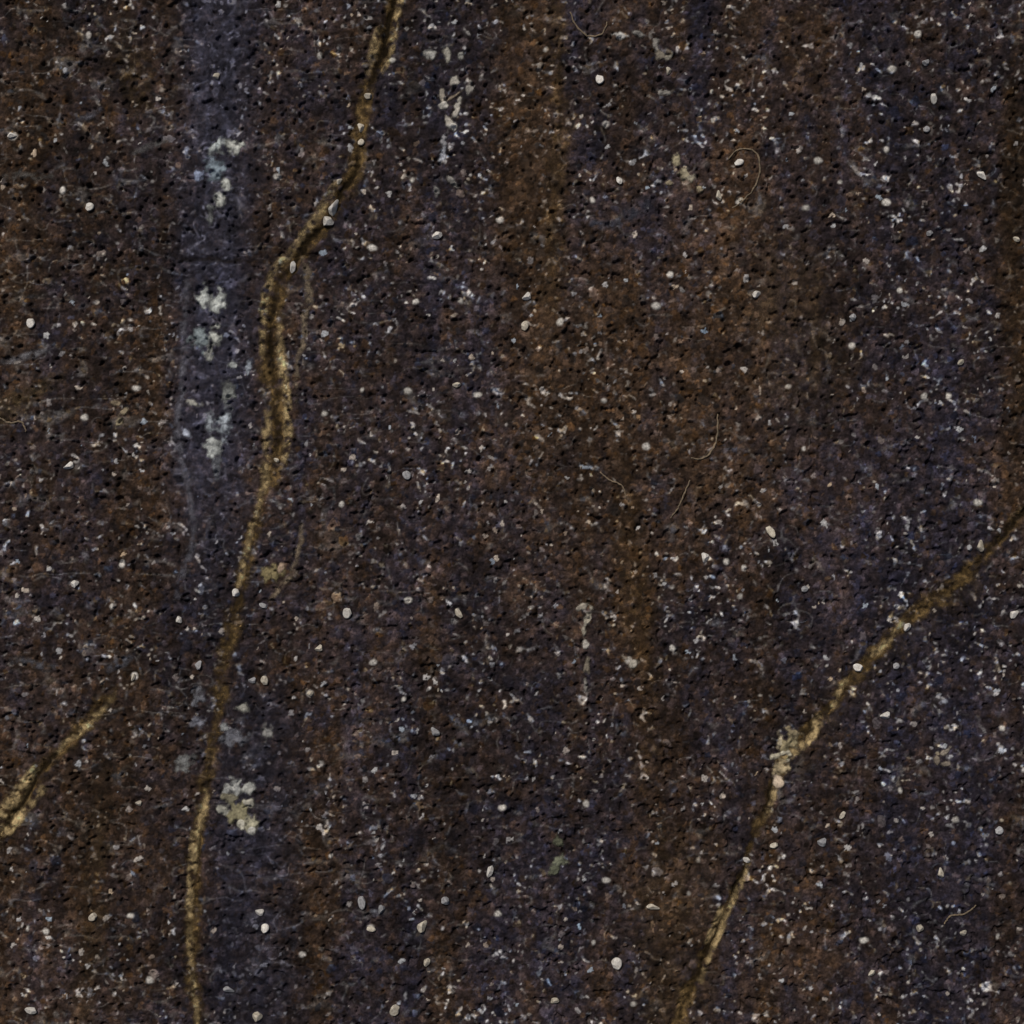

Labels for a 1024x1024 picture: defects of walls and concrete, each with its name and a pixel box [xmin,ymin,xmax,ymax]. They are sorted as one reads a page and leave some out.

leakage [175,0,251,577]
crack [185,0,403,1024]
crack [0,696,114,837]
leakage [176,755,195,771]
leakage [190,687,205,726]
leakage [219,722,275,787]
crack [671,509,1024,1024]